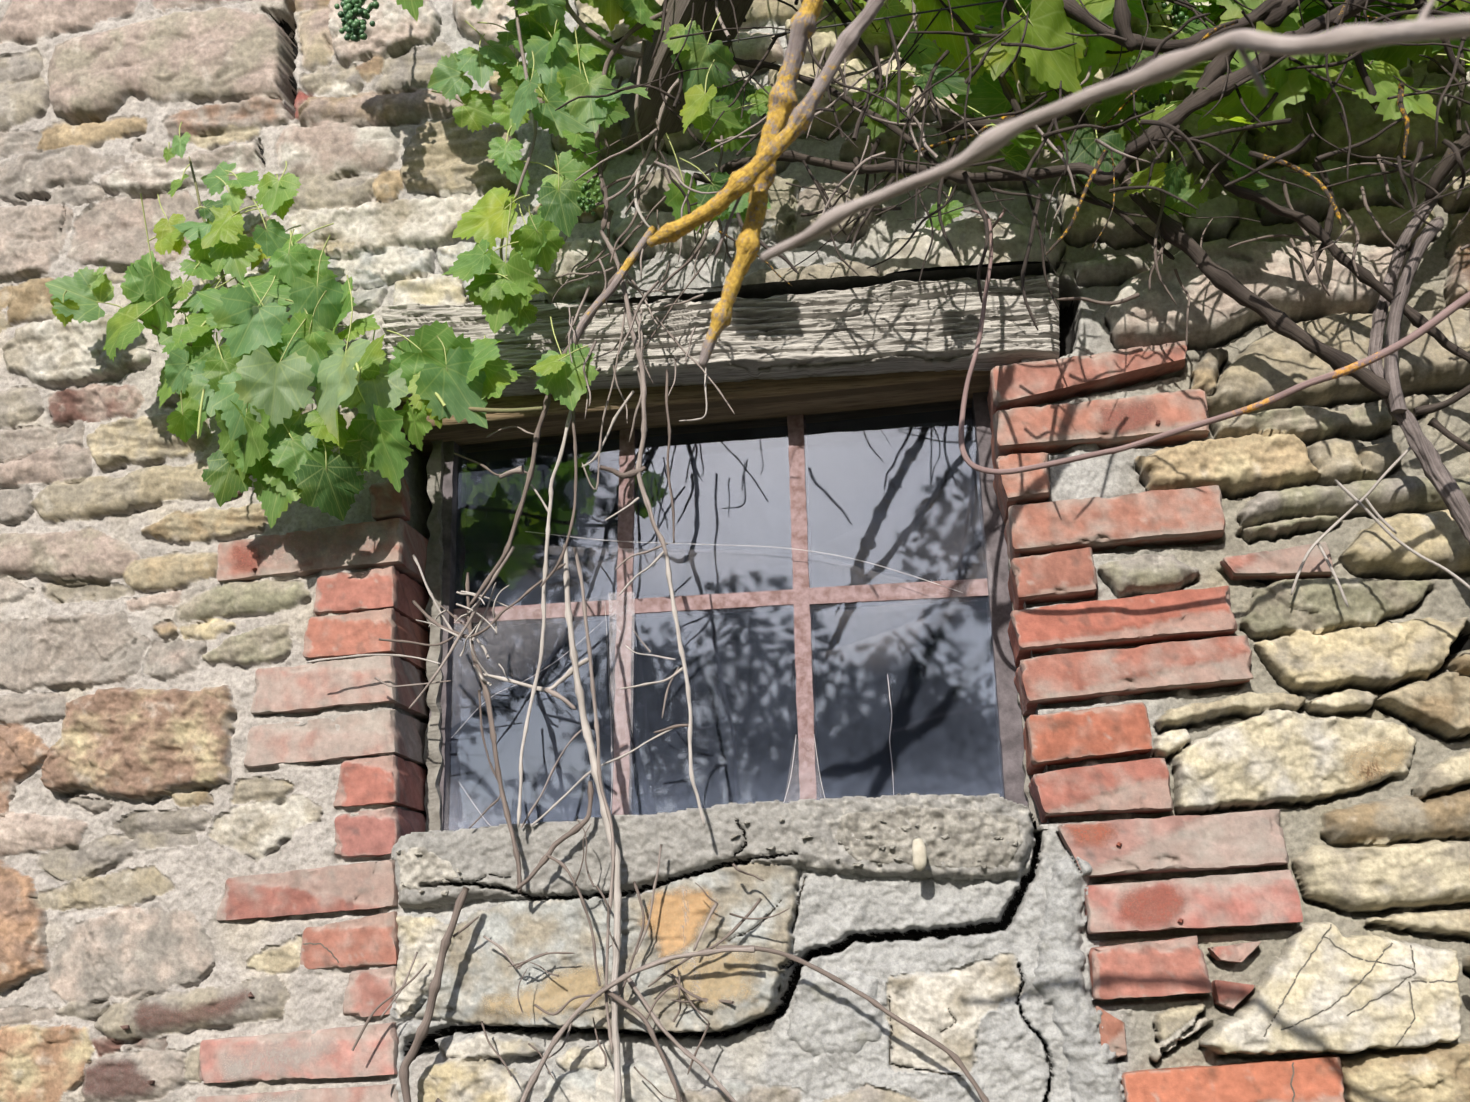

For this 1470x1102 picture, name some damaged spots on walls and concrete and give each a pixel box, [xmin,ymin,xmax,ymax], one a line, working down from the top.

crack [426,818,1041,1038]
crack [889,996,961,1077]
crack [1017,965,1053,1102]